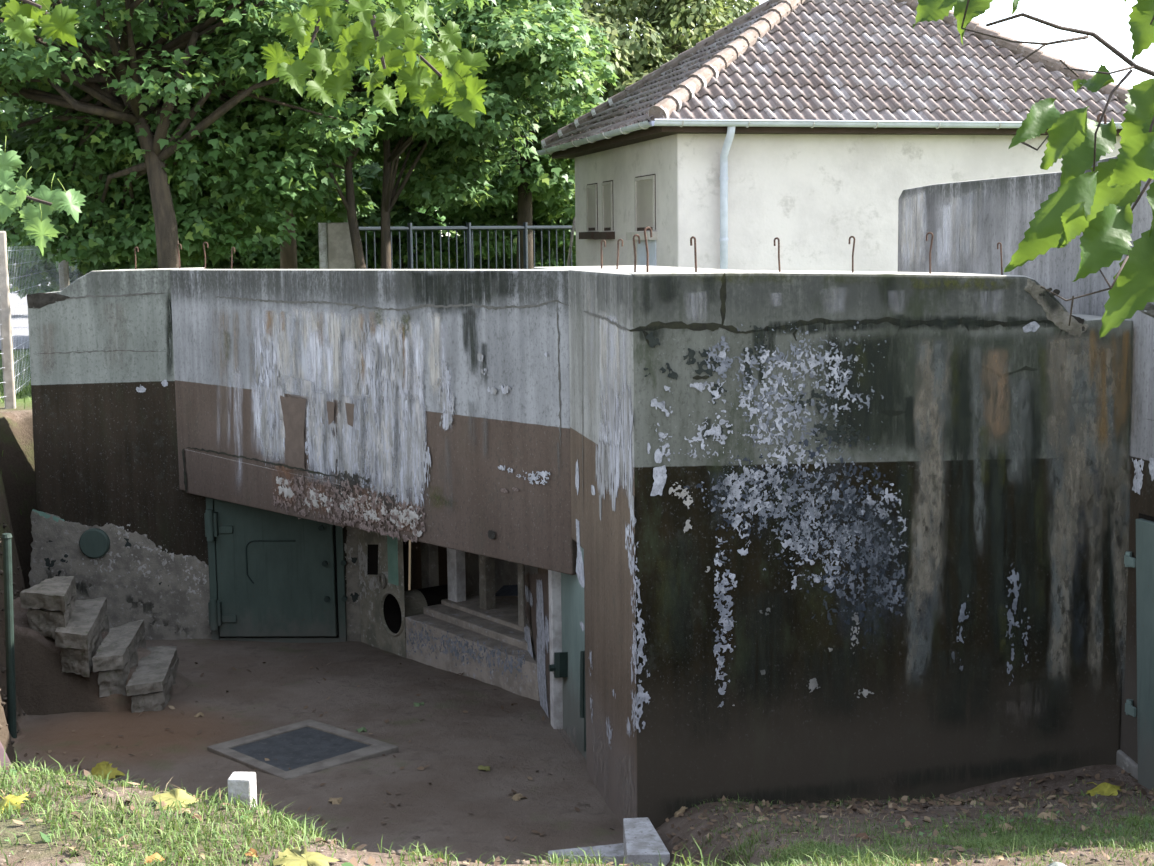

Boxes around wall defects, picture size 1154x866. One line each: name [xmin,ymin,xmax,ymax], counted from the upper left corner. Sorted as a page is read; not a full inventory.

peeling [255,321,455,641]
water stain [220,272,514,496]
peeling [477,353,510,394]
peeling [498,465,550,493]
peeling [575,376,651,744]
crack [215,273,1063,472]
water stain [644,277,676,309]
peeling [644,322,915,707]
peeling [1132,457,1154,495]